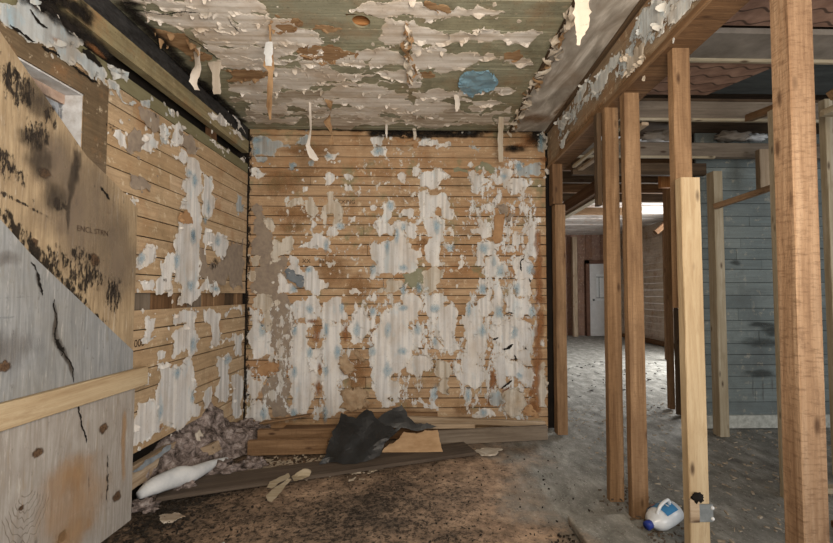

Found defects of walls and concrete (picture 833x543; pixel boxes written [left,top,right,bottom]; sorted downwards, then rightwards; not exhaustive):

leakage [0,62,132,323]
peeling [0,0,153,108]
peeling [107,119,130,149]
peeling [554,0,696,149]
crack [31,262,74,382]
leakage [53,309,72,372]
peeling [133,102,549,451]
crack [78,406,87,443]